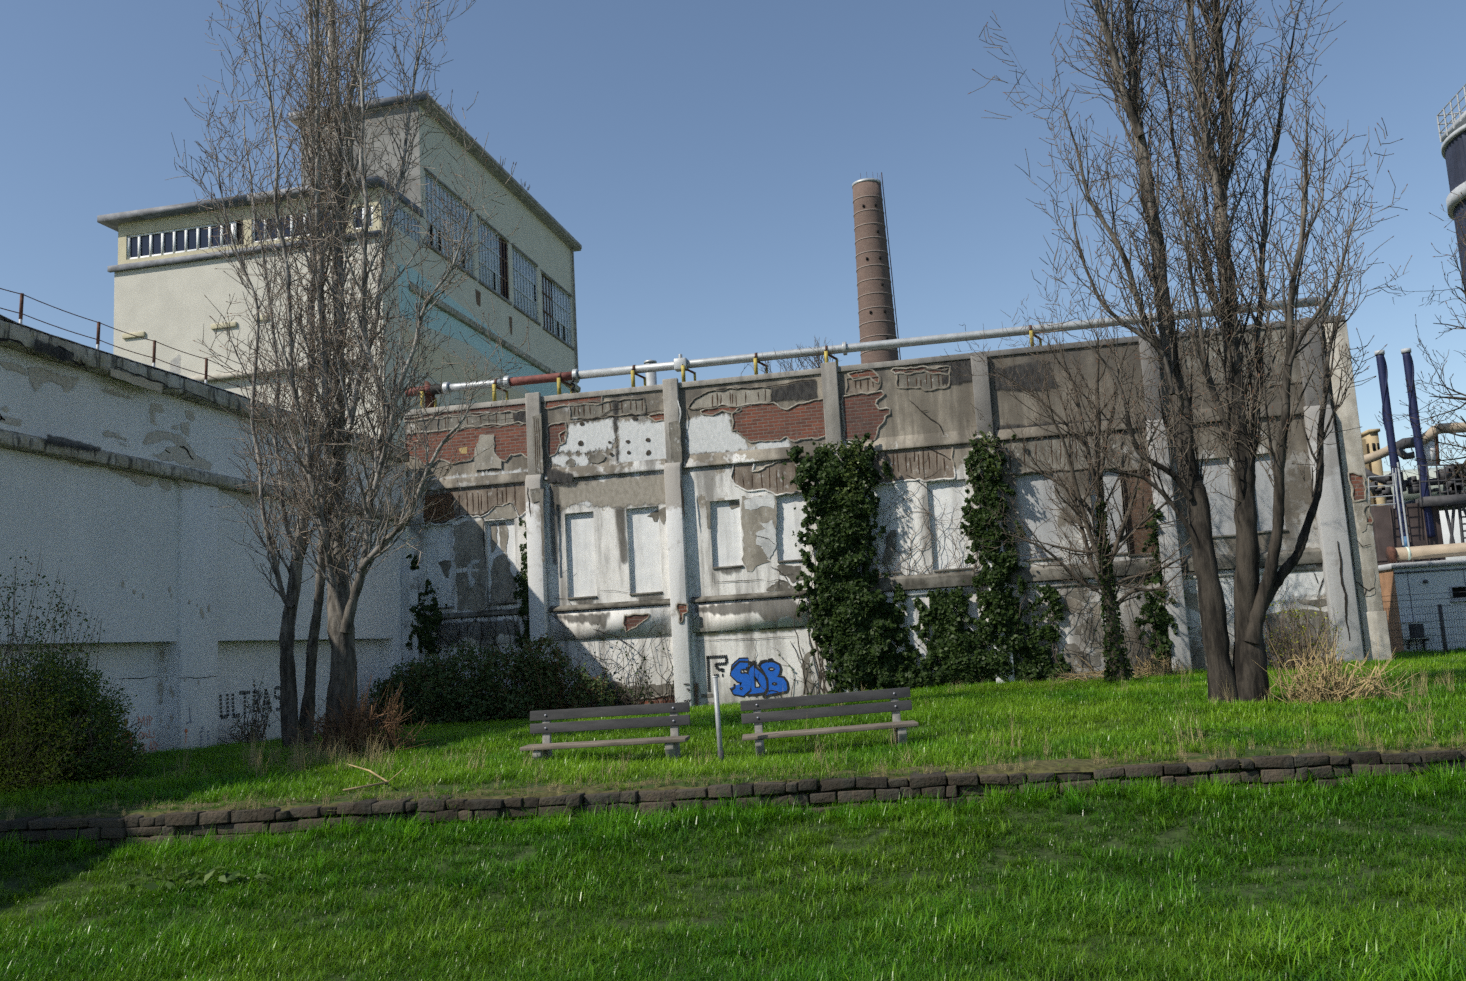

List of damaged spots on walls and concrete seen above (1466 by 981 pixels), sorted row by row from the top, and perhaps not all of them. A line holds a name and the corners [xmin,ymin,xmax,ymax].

peeling [103,403,212,470]
peeling [403,365,956,619]
crack [1314,540,1375,641]